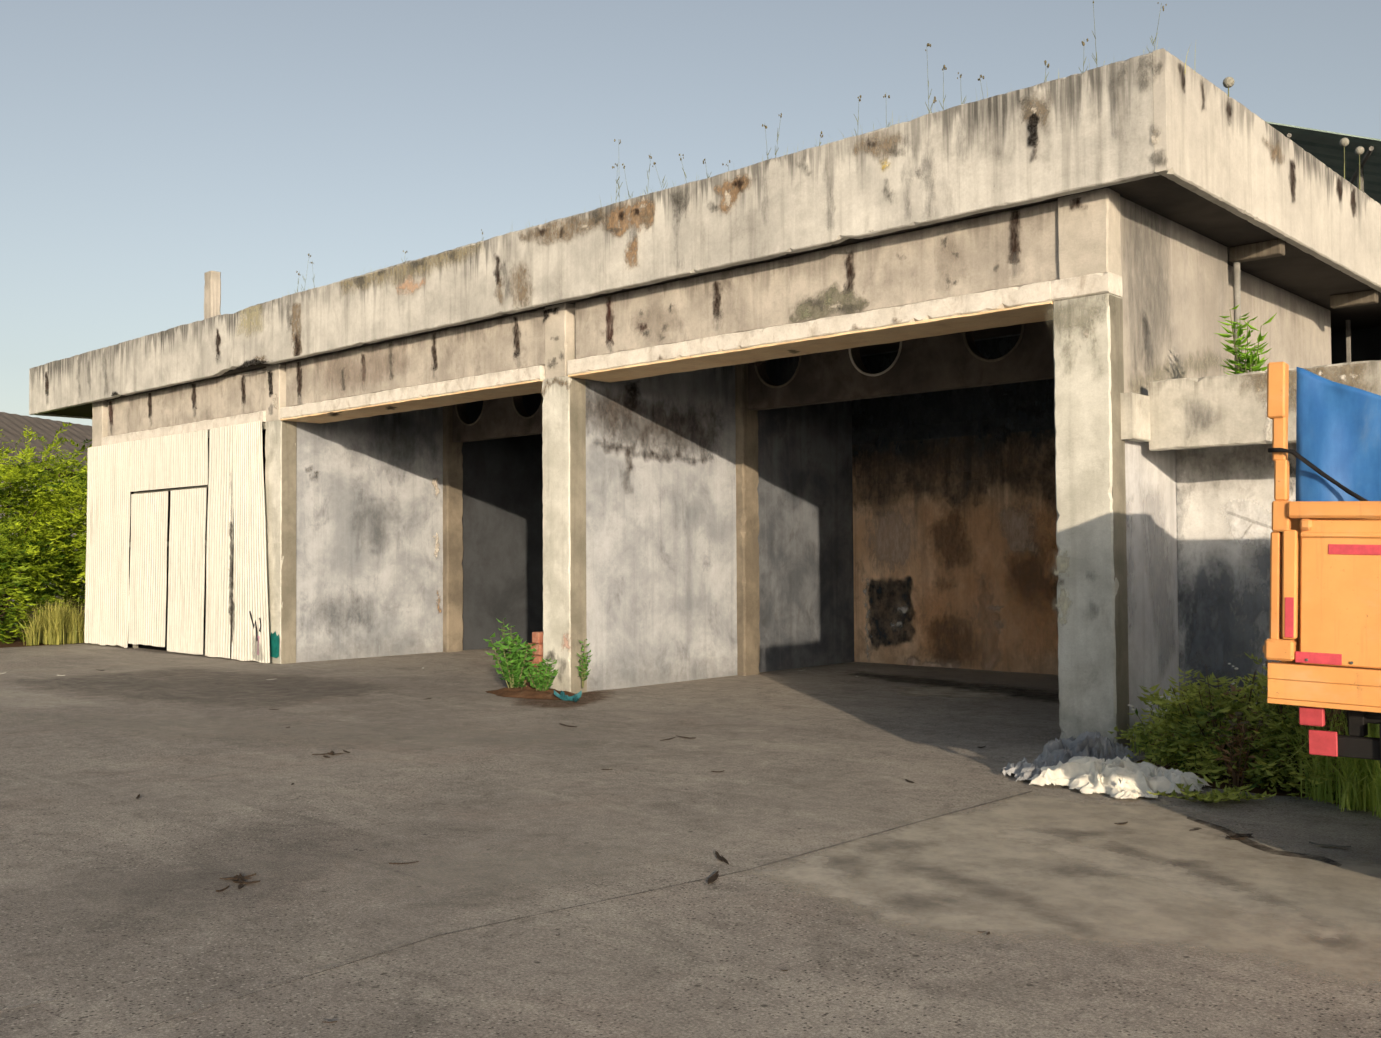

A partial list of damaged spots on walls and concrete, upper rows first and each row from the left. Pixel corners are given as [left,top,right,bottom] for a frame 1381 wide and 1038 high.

rust [494,256,502,304]
rust [626,232,638,267]
water stain [287,304,302,356]
water stain [586,390,721,453]
water stain [863,510,916,655]
water stain [1146,496,1280,704]
water stain [852,578,1059,701]